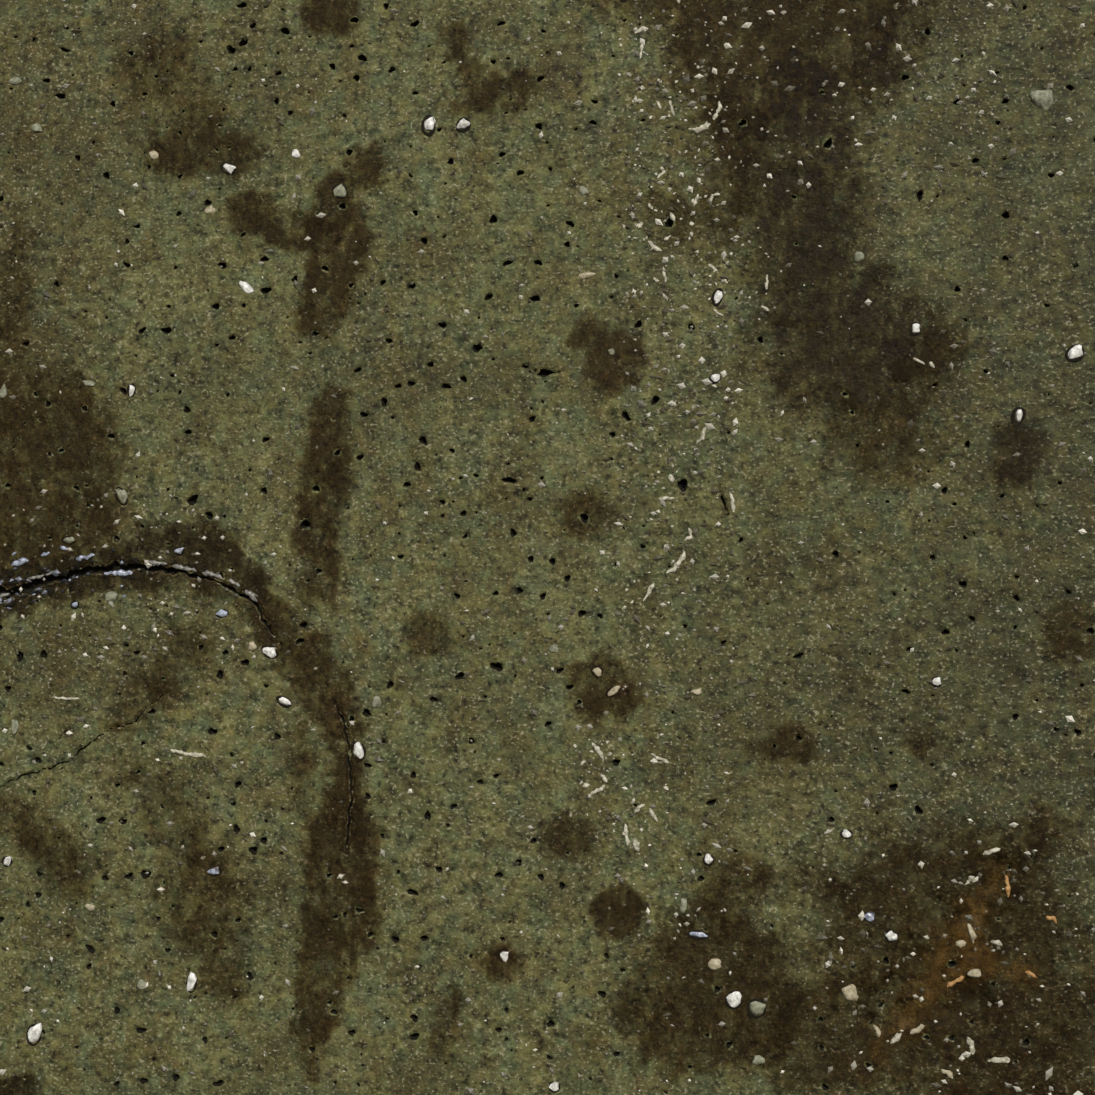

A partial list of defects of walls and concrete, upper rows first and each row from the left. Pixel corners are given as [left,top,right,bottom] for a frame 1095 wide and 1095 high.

damp [622,205,672,252]
damp [632,0,935,399]
damp [649,455,678,522]
crack [0,546,283,645]
damp [50,524,328,686]
damp [666,528,693,582]
crack [0,681,179,791]
crack [328,698,357,858]
damp [726,937,760,1014]
damp [978,1040,1055,1095]